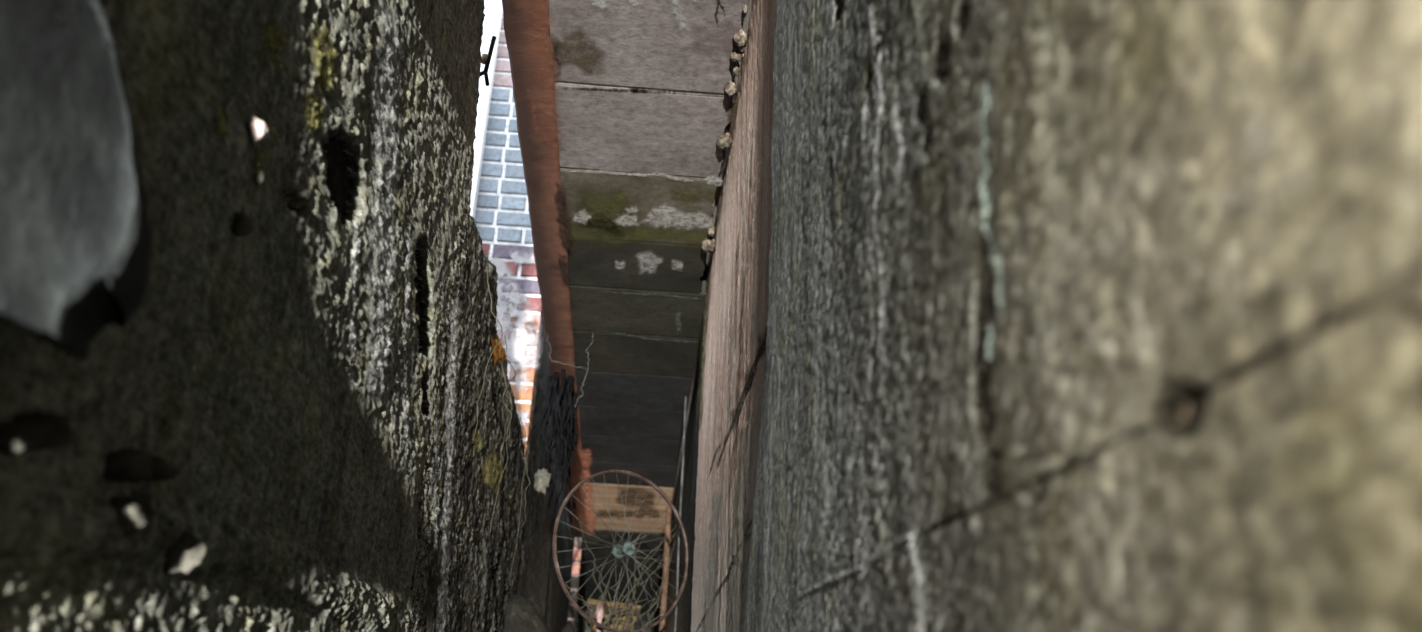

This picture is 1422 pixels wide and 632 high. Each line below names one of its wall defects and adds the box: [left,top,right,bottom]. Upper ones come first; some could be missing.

leakage [551,31,601,78]
spalling [304,95,359,222]
corrosion [555,183,572,284]
leakage [570,171,722,232]